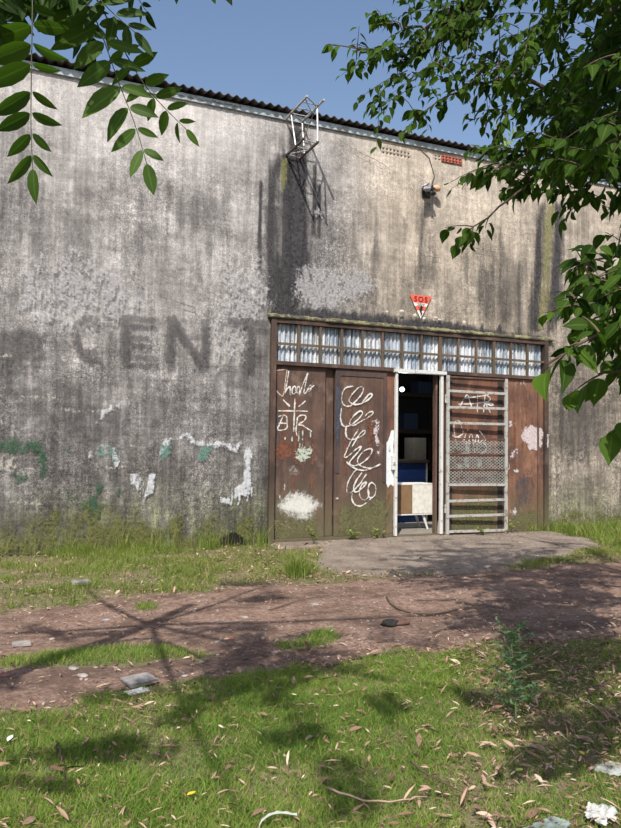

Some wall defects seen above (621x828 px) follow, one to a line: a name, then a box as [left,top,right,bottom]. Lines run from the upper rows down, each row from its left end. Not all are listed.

leakage [208,126,564,371]
rust [275,399,314,495]